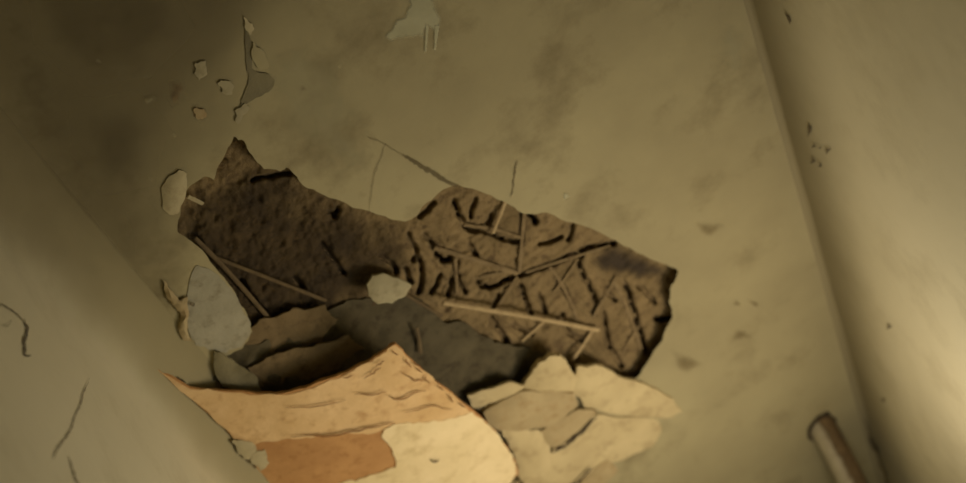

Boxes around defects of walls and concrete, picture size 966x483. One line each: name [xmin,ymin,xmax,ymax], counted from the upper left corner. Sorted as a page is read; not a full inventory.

peeling [218,17,275,124]
crack [405,156,457,187]
crack [0,304,31,357]
spalling [161,137,683,483]
crack [54,385,87,483]